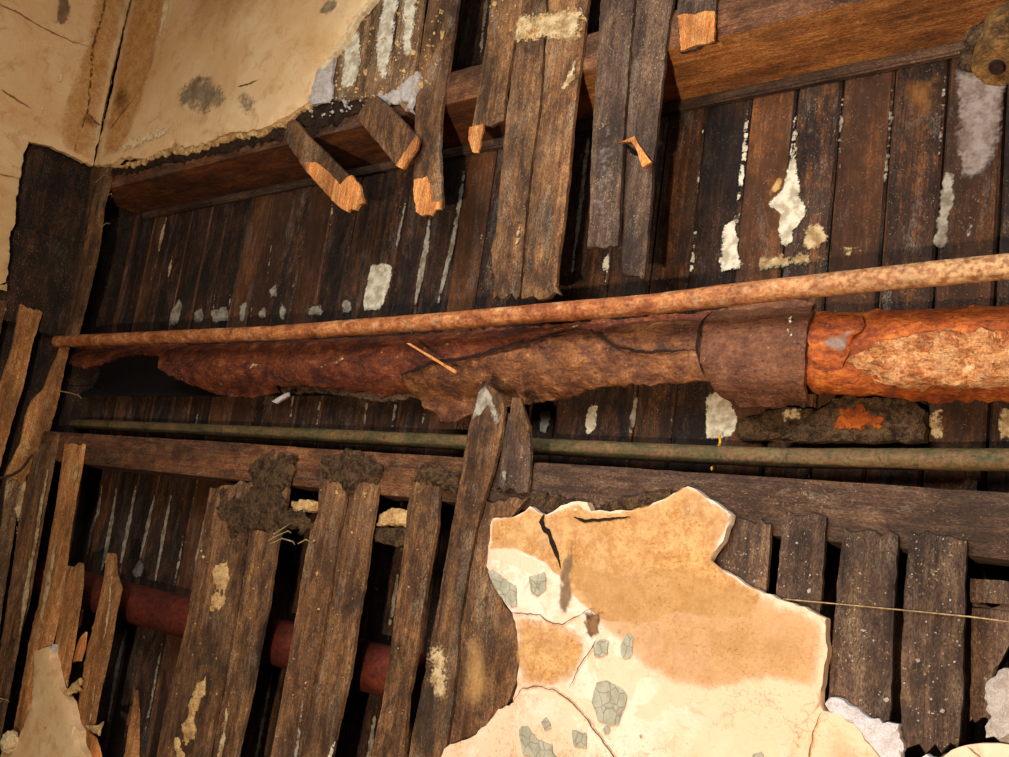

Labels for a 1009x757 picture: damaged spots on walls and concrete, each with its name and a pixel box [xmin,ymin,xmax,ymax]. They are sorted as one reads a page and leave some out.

leakage [57,0,70,24]
leakage [179,76,225,114]
corrosion [403,320,710,423]
corrosion [846,327,1009,393]
corrosion [835,402,883,430]
crack [539,514,561,568]
crack [574,515,629,523]
peeling [596,489,673,512]
peeling [488,570,517,607]
leakage [490,488,815,684]
crack [512,641,614,757]
peeling [592,681,627,734]